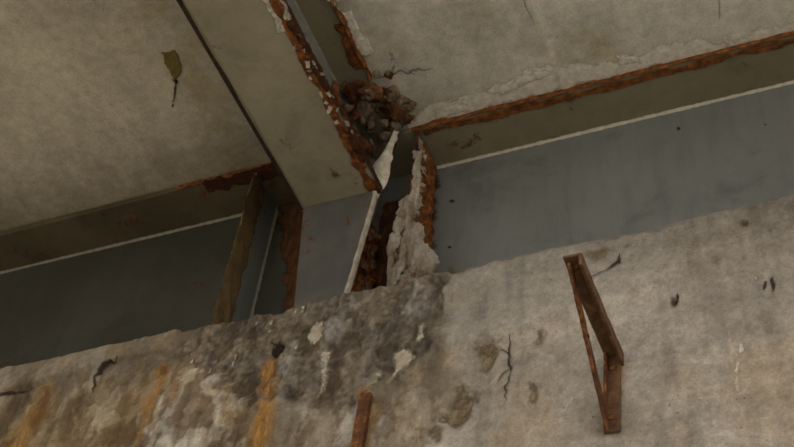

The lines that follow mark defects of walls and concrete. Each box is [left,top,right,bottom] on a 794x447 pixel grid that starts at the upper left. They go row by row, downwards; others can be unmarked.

peeling [262,0,292,33]
corrosion [269,0,383,194]
spalling [338,69,417,198]
corrosion [411,31,794,249]
corrosion [277,203,303,312]
corrosion [350,197,403,293]
crack [0,383,45,396]
crack [92,355,118,393]
corrosion [252,342,284,447]
peeling [307,322,323,344]
peeling [393,349,414,377]
crack [497,334,512,402]